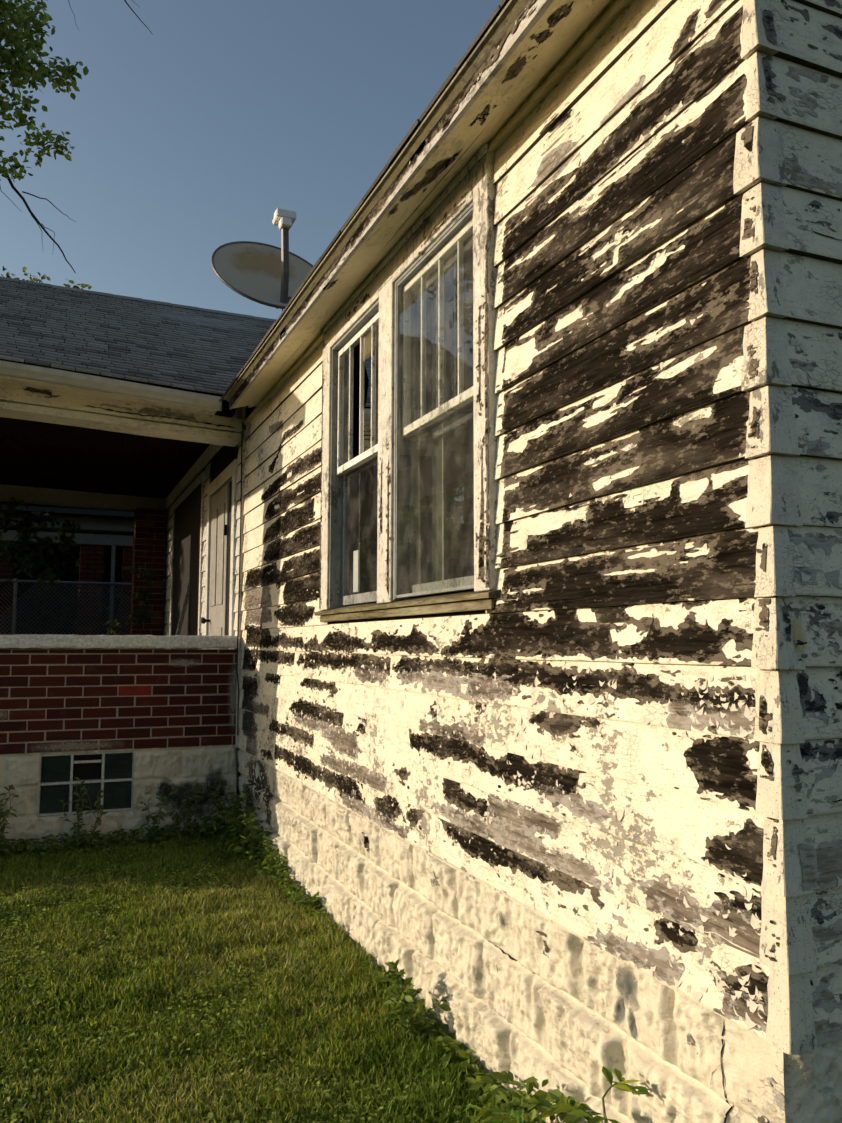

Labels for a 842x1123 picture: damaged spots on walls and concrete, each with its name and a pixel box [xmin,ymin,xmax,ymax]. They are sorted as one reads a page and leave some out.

peeling [763,0,842,117]
peeling [784,145,842,231]
peeling [786,331,842,481]
peeling [229,0,779,1035]
peeling [783,510,842,819]
peeling [791,837,842,1046]
crack [710,1022,733,1123]